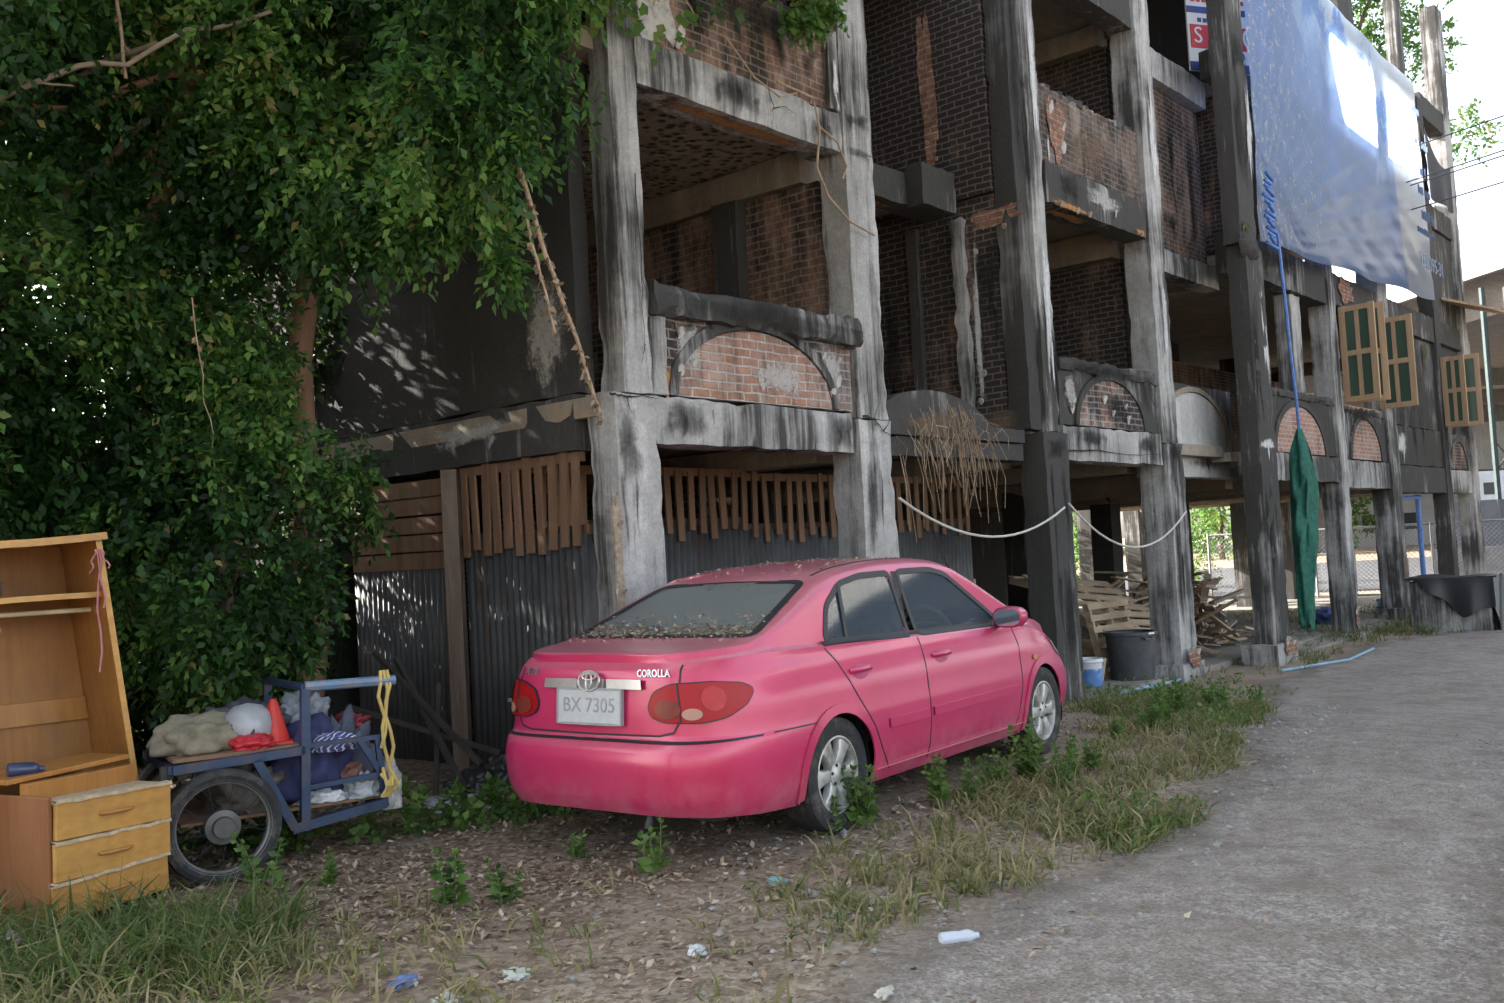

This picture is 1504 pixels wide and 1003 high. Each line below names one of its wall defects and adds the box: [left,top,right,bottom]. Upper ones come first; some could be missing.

flaking render [1045,95,1067,167]
leakage [758,365,798,395]
leakage [668,404,696,435]
leakage [621,421,639,540]